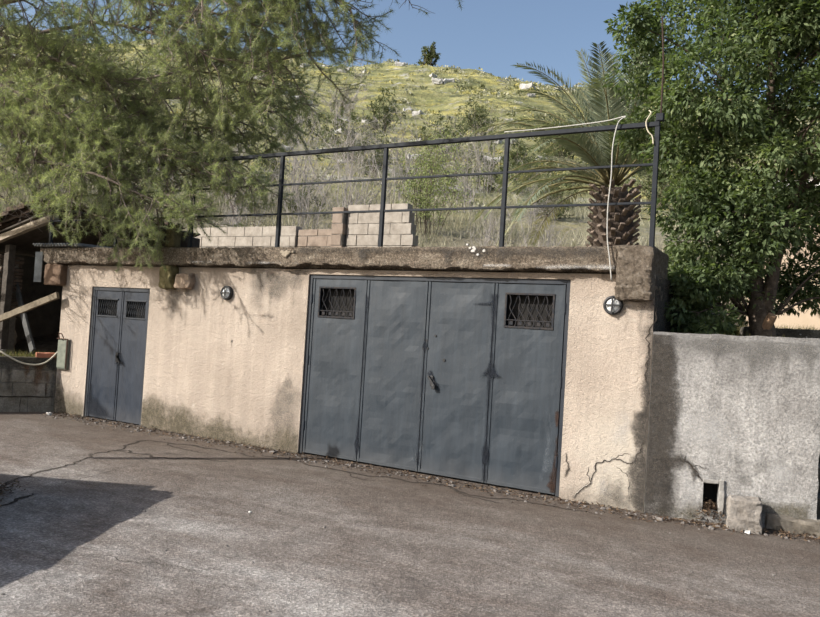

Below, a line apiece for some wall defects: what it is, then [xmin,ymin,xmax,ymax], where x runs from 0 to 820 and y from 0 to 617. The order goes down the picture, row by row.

crack [644,304,657,420]
damp [629,275,686,516]
corrosion [548,440,557,493]
crack [566,443,643,498]